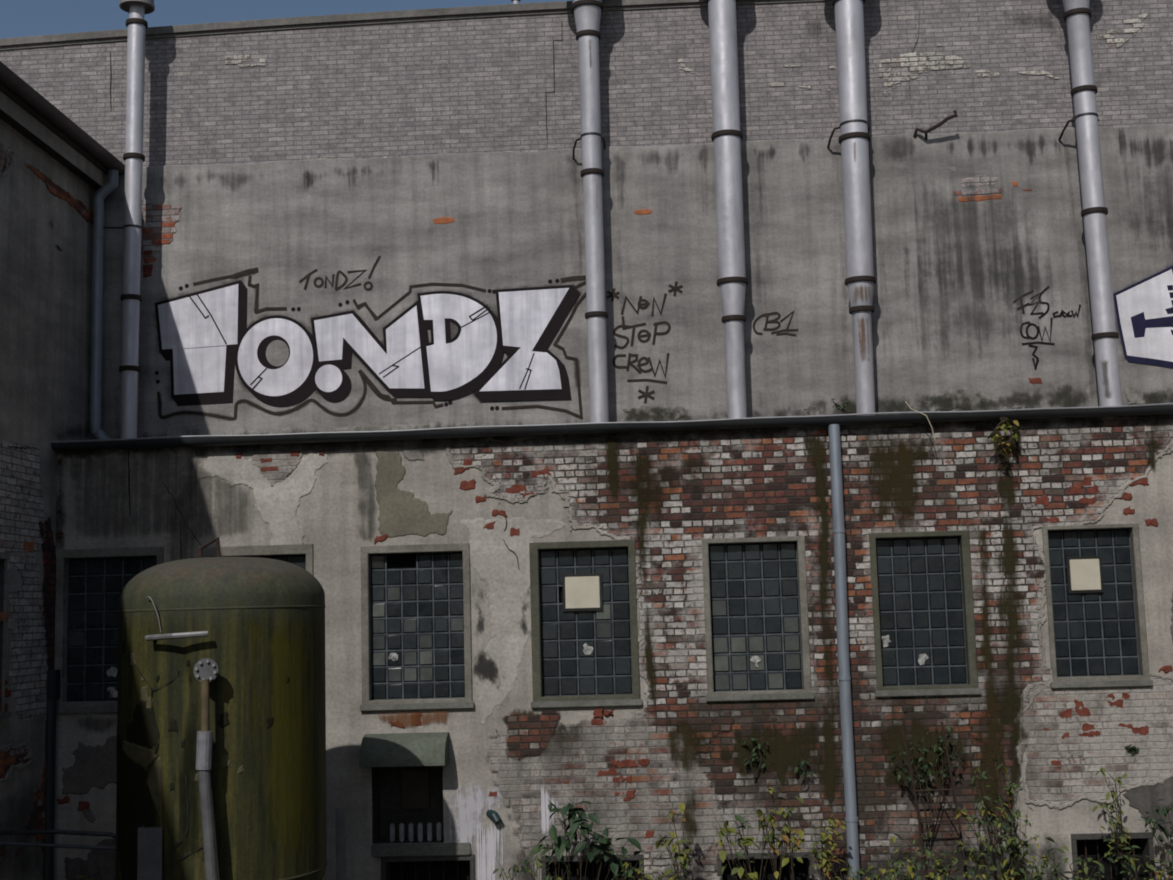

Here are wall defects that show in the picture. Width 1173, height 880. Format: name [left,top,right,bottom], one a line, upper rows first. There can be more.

flaking render [0,140,93,224]
damp [1026,137,1057,158]
damp [1119,134,1173,165]
flaking render [141,199,182,278]
flaking render [0,439,63,722]
flaking render [198,389,1173,880]